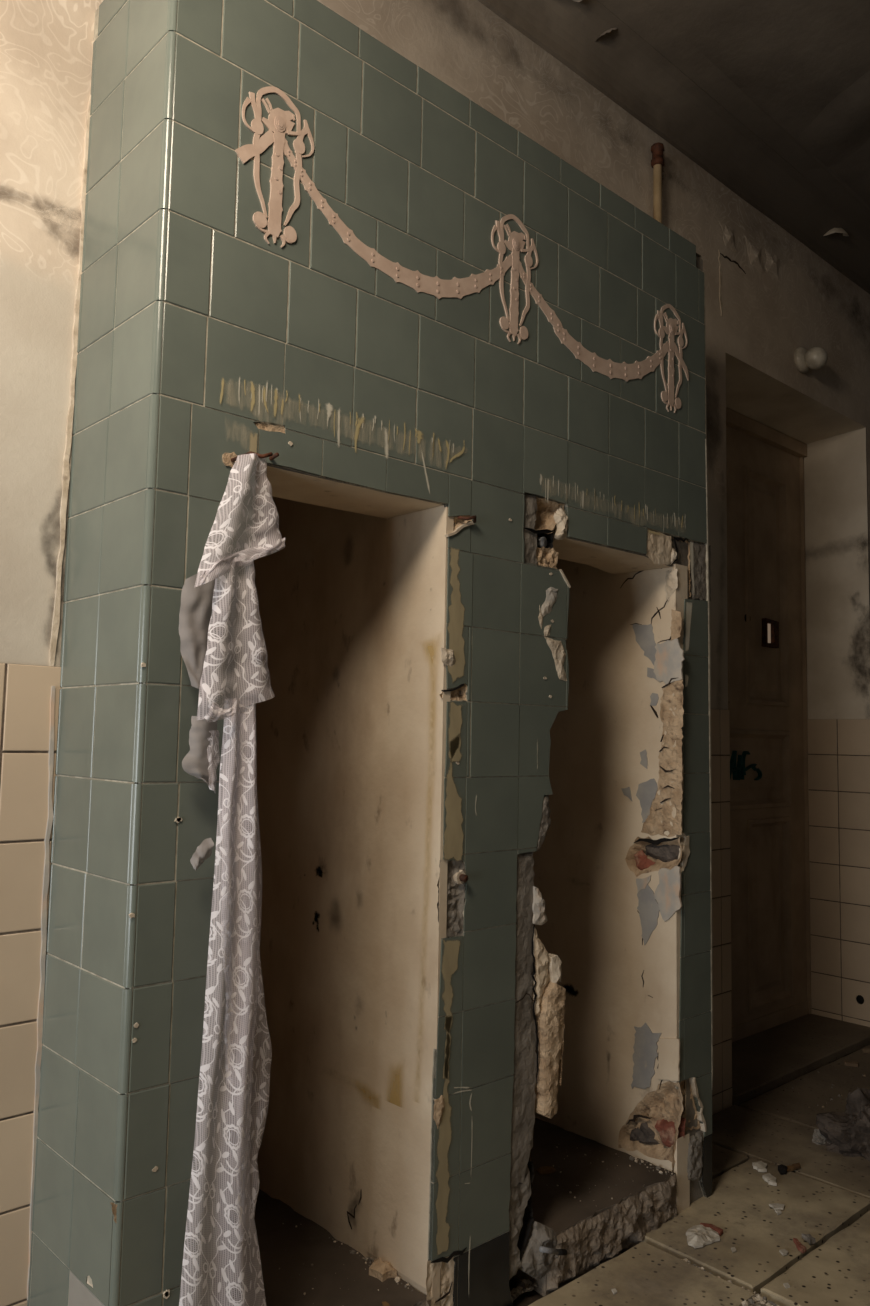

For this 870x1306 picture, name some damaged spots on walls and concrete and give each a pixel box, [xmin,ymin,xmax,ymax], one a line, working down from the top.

peeling [420,515,477,1306]
spalling [509,495,571,681]
spalling [509,796,707,1293]
peeling [621,528,711,945]